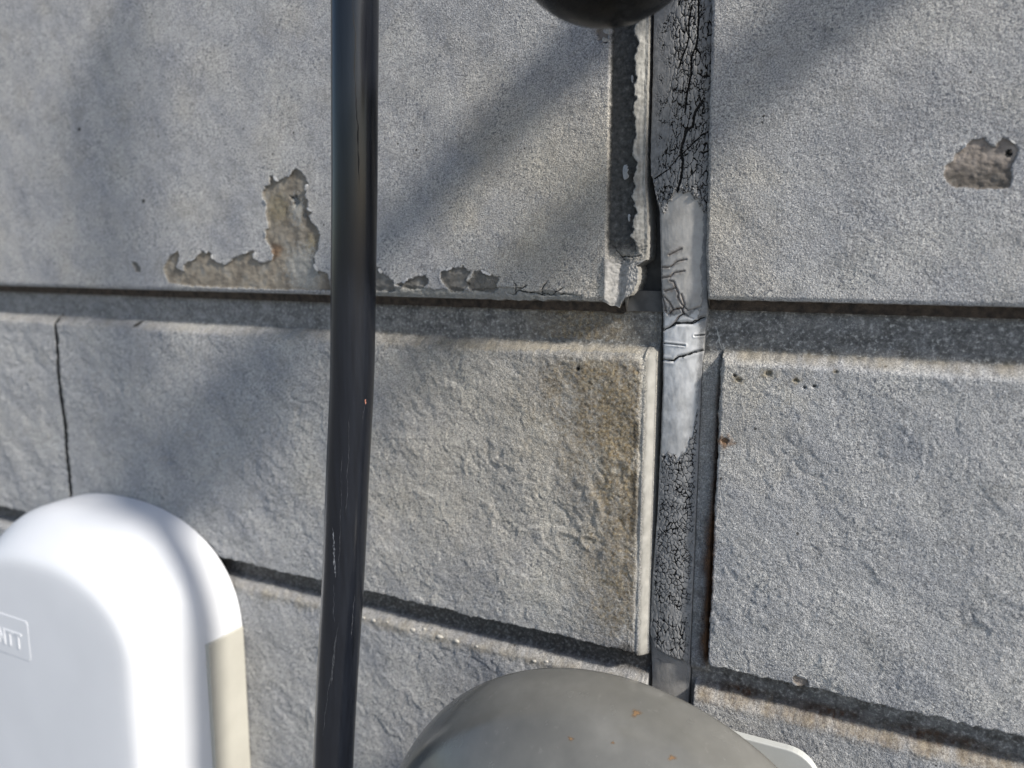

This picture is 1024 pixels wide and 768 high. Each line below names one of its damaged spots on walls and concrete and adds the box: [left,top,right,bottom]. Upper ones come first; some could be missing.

crack [654,0,712,212]
spalling [944,138,1018,189]
peeling [164,170,330,290]
peeling [376,268,428,292]
peeling [441,266,491,292]
spalling [604,258,646,308]
crack [662,251,719,361]
crack [54,317,73,497]
crack [653,424,697,664]